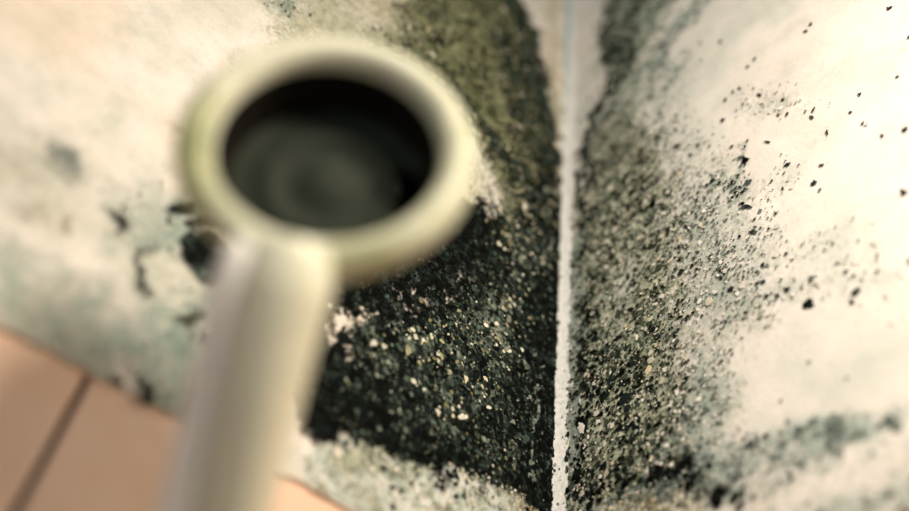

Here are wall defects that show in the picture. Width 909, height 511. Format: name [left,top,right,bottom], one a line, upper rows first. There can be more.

damp [111,190,141,234]
damp [264,0,909,511]